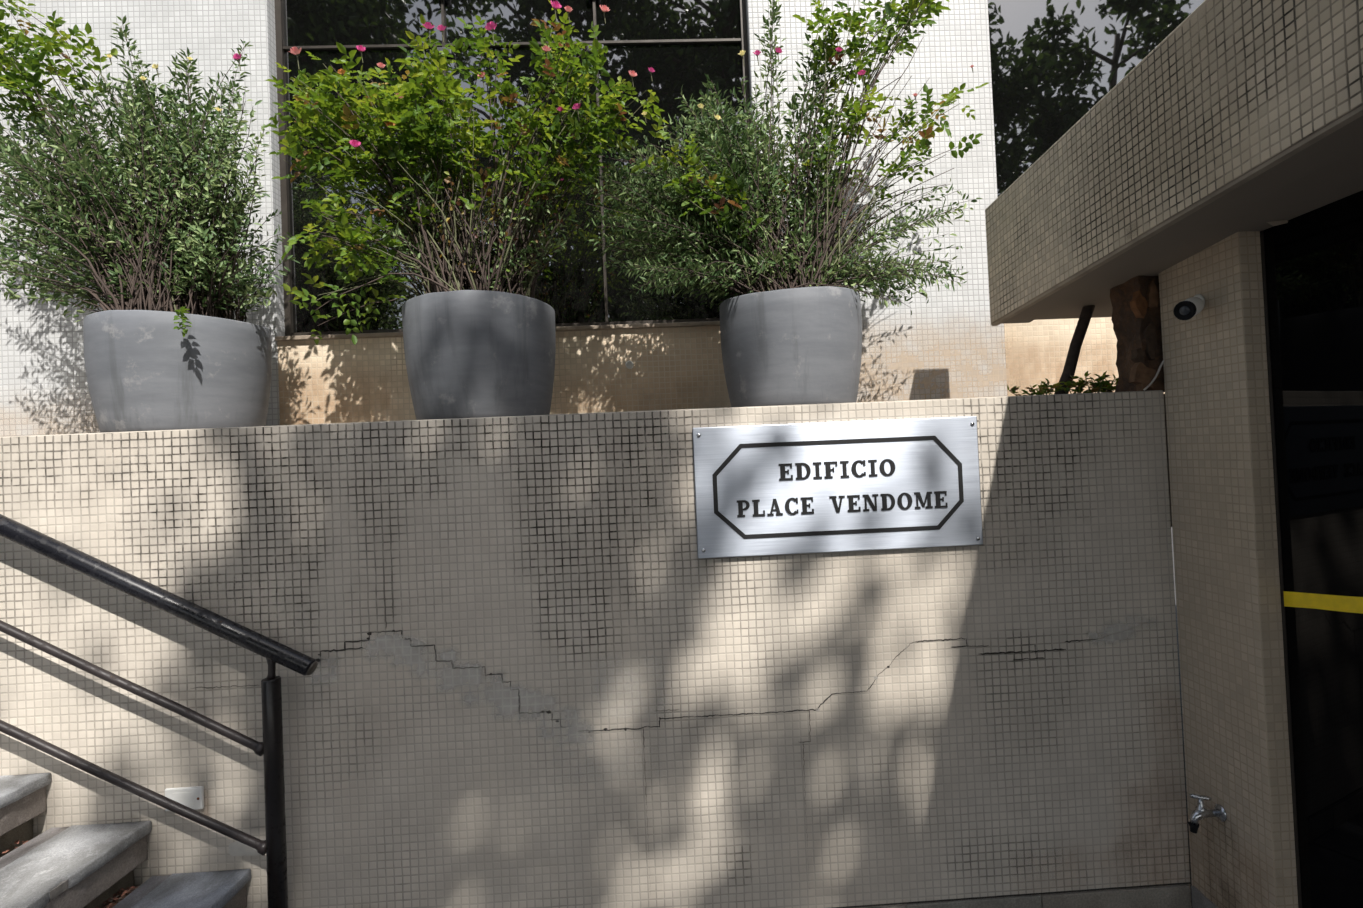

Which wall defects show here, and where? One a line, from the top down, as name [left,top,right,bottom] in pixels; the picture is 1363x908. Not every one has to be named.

leakage [0,410,694,630]
leakage [575,582,607,651]
crack [315,536,1146,892]